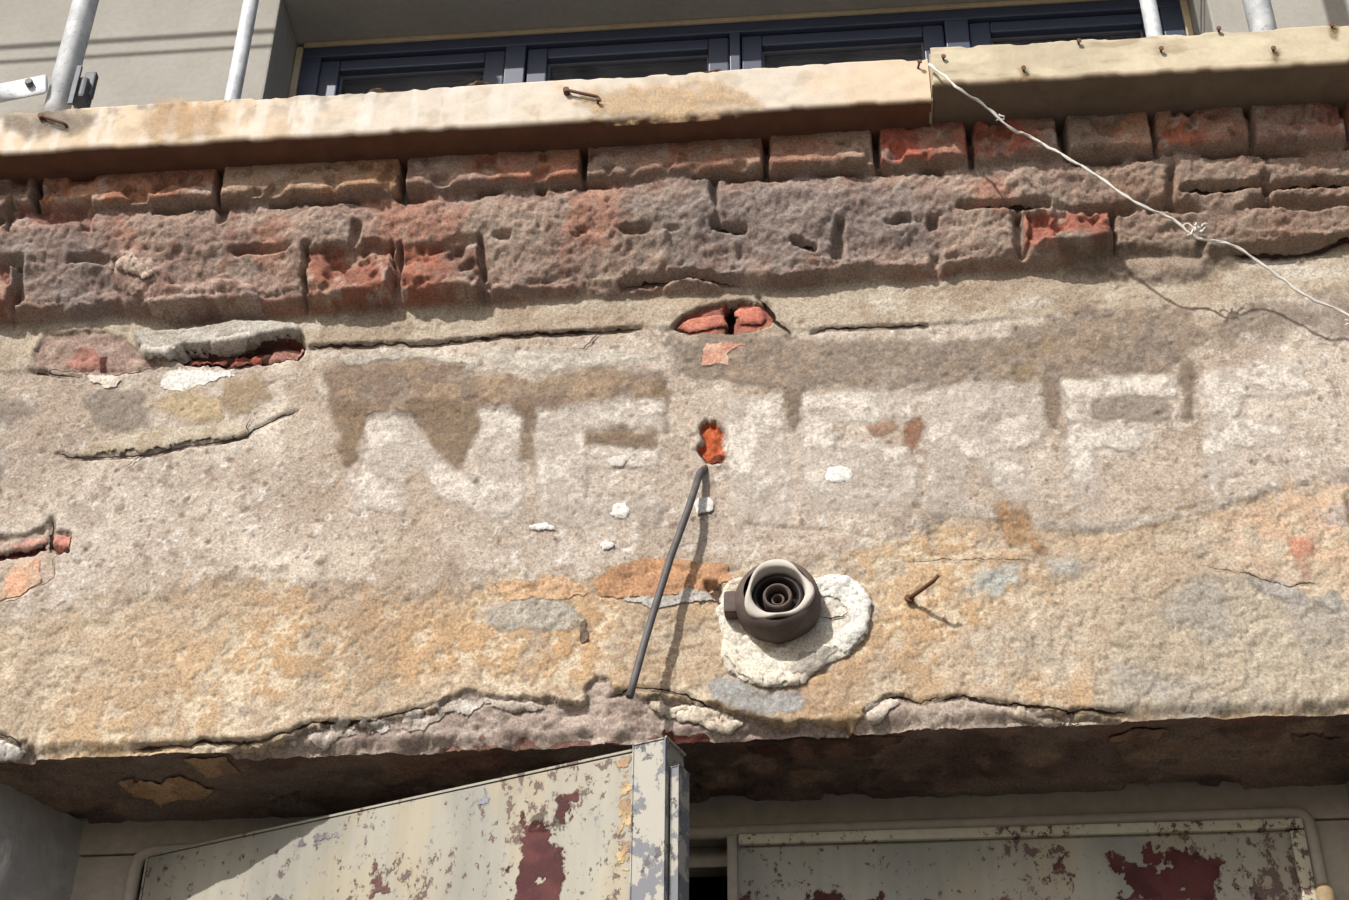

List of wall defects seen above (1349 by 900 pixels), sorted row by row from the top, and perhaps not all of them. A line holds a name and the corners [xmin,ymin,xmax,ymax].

spalling [33,320,305,388]
crack [313,328,639,349]
spalling [674,301,773,366]
crack [61,411,297,467]
spalling [698,421,727,464]
spalling [0,522,71,603]
crack [135,704,433,751]
crack [612,687,714,708]
crack [887,694,1126,716]